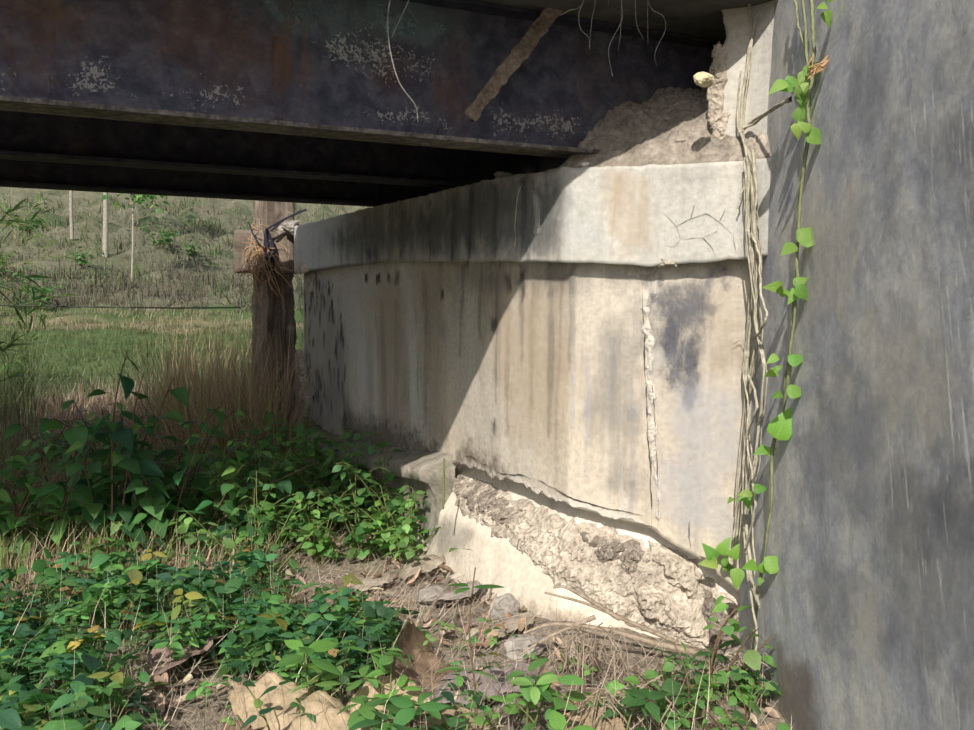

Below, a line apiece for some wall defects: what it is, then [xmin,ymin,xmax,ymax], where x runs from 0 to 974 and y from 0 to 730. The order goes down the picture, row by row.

spalling [707,41,730,141]
leakage [338,181,556,260]
crack [639,281,661,530]
leakage [651,279,713,406]
spalling [452,456,742,658]